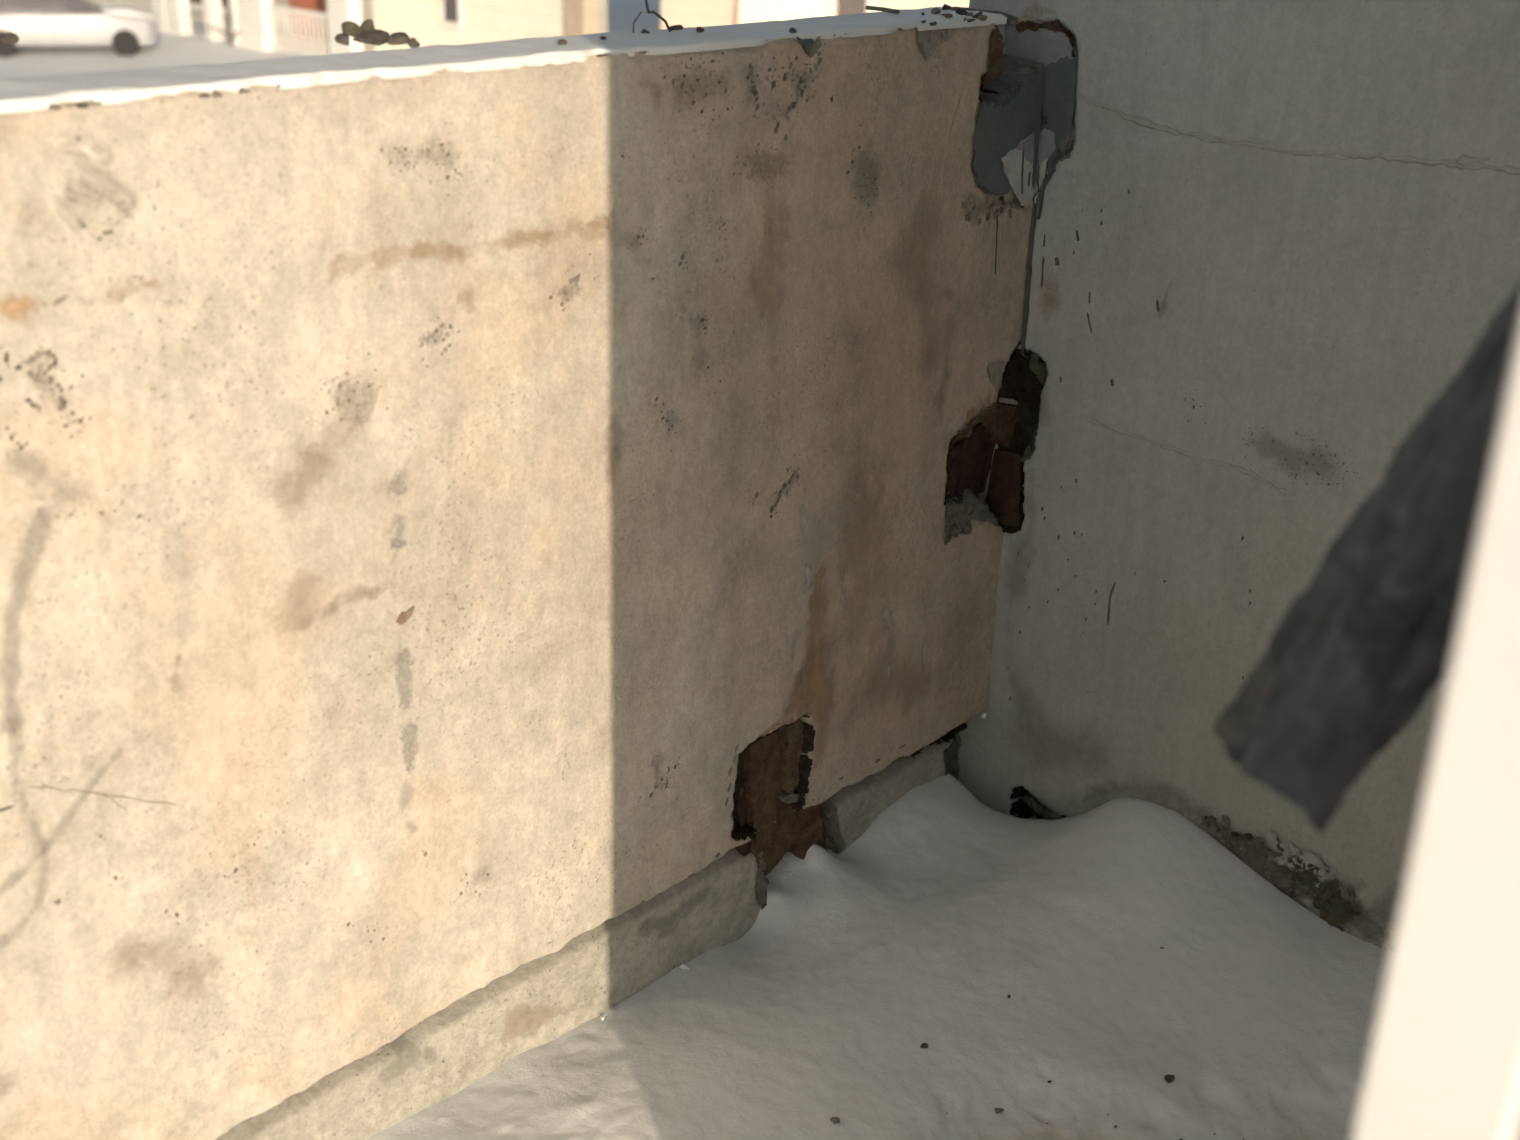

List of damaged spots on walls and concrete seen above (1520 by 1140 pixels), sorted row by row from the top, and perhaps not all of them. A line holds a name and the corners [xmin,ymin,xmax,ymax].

spalling [965,8,1076,104]
peeling [961,132,1073,225]
crack [1076,93,1520,175]
spalling [944,341,1049,545]
spalling [725,714,846,909]
damp [1202,815,1381,939]